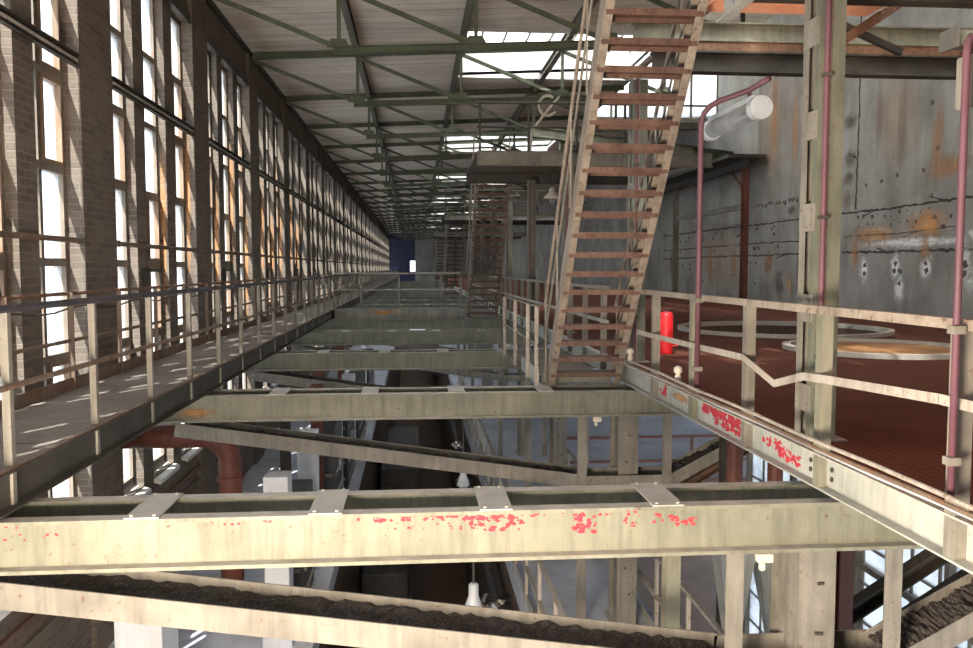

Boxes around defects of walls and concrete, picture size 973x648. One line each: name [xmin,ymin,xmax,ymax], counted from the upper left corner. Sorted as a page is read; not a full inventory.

crack [842,78,973,254]